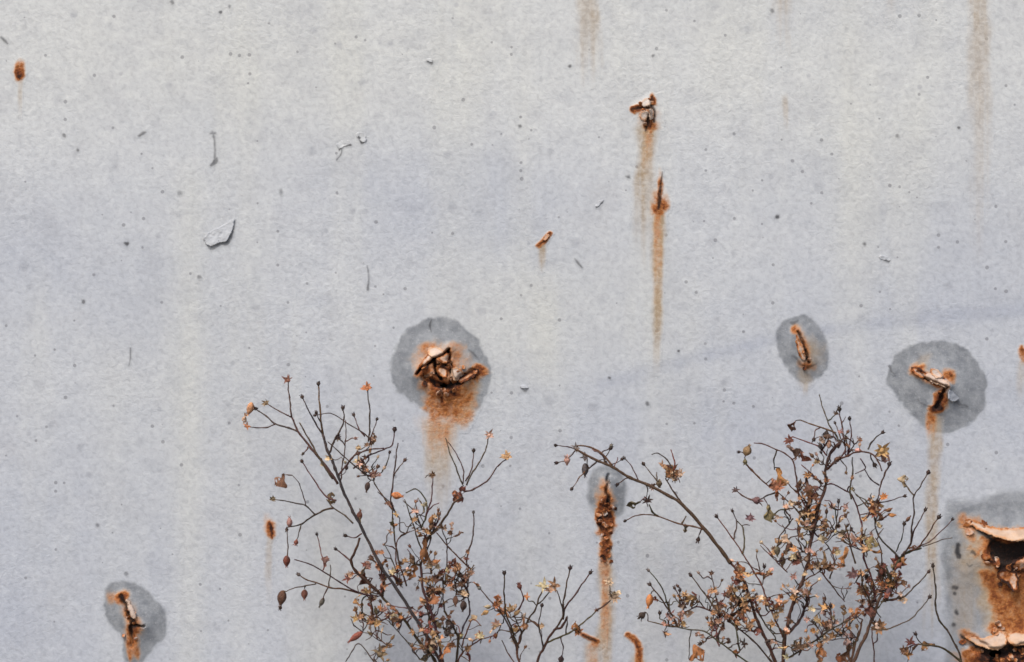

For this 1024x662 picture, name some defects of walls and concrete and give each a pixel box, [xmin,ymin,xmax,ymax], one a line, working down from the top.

corrosion [10,56,28,120]
corrosion [533,229,555,274]
corrosion [627,91,673,377]
corrosion [579,630,606,662]